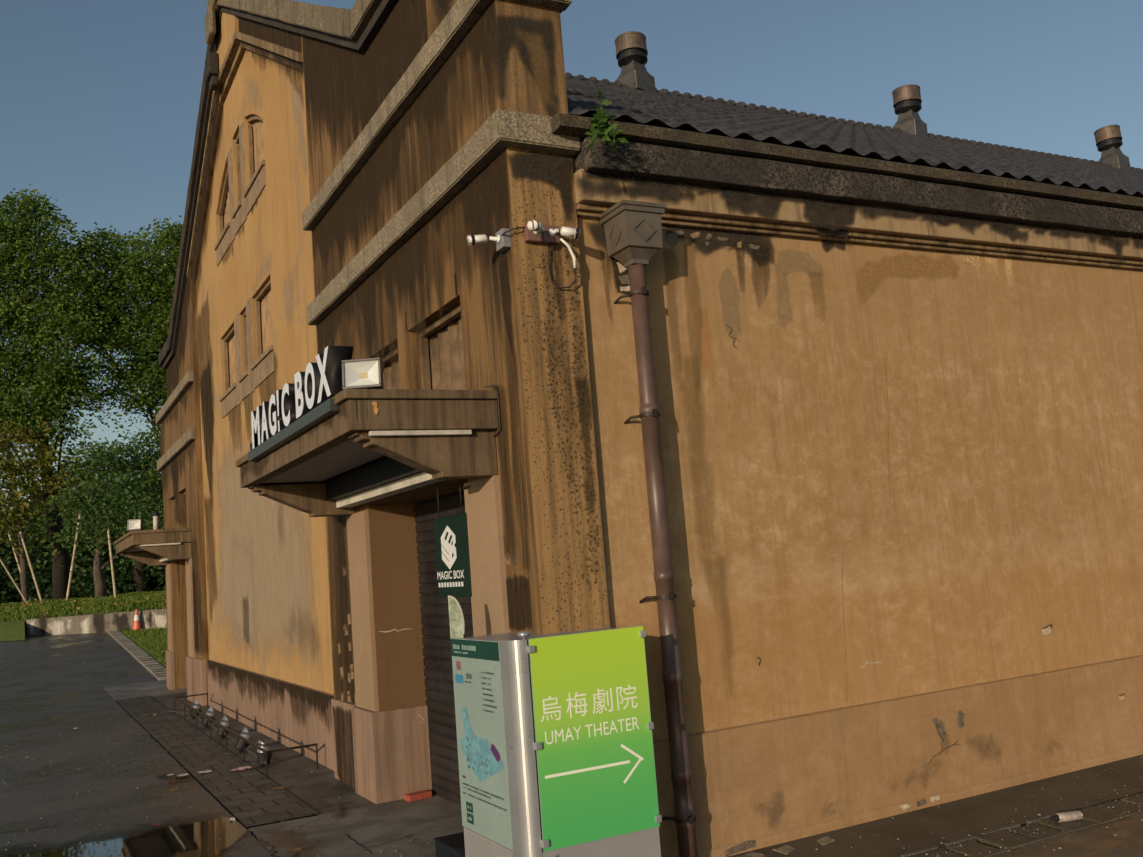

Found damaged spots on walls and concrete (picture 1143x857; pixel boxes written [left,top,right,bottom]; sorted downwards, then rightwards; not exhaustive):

damp [312,0,498,294]
damp [577,172,1143,258]
damp [160,100,346,726]
damp [539,248,600,591]
flaking render [933,710,965,743]